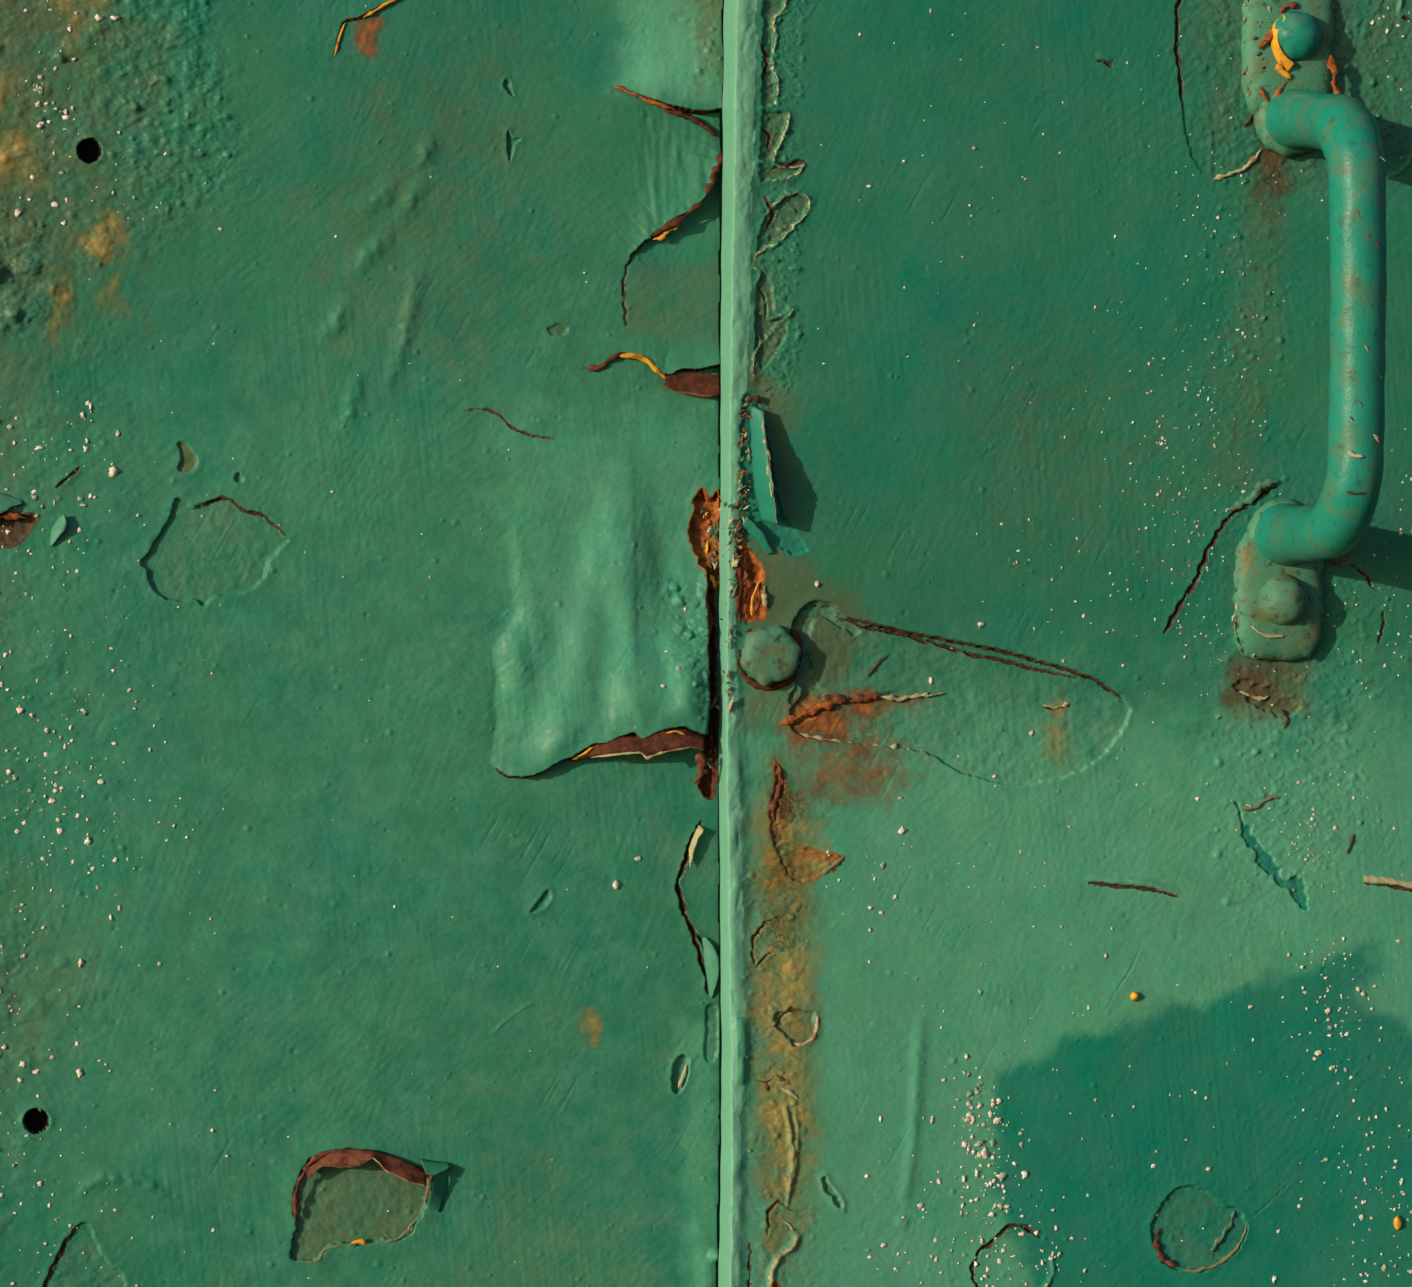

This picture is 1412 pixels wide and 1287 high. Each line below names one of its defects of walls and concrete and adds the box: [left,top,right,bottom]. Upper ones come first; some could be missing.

corrosion [356,19,381,54]
peeling [1173,0,1329,198]
peeling [1326,0,1412,183]
peeling [492,0,814,784]
peeling [139,469,291,609]
crack [1163,478,1279,634]
crack [1346,450,1364,495]
peeling [777,598,1134,788]
corrosion [753,788,829,1193]
peeling [41,1219,129,1287]
peeling [288,1145,450,1265]
peeling [1149,1182,1249,1276]